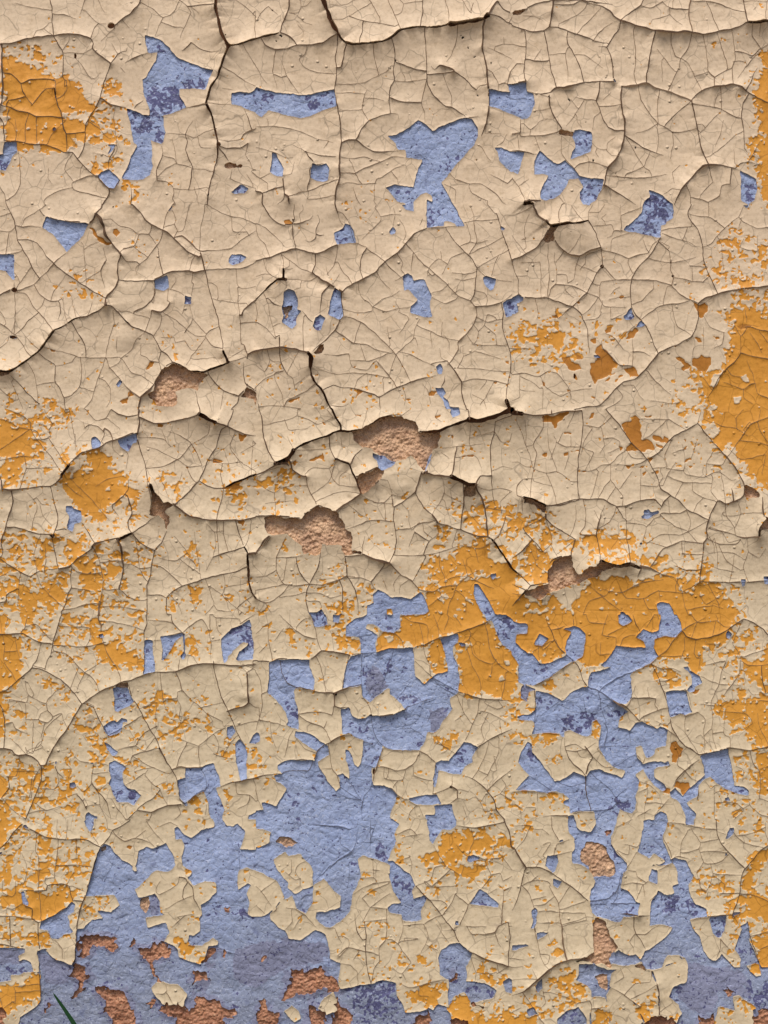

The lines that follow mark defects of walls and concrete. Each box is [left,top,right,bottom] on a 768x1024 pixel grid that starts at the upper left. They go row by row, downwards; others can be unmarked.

peeling [0,32,213,208]
crack [101,0,153,41]
crack [155,0,246,82]
peeling [231,86,337,118]
peeling [361,108,478,232]
crack [516,514,576,572]
peeling [0,217,768,1024]
crack [62,757,117,821]
crack [223,648,468,819]
crack [335,869,439,997]
crack [612,962,672,1015]
crack [662,784,768,961]